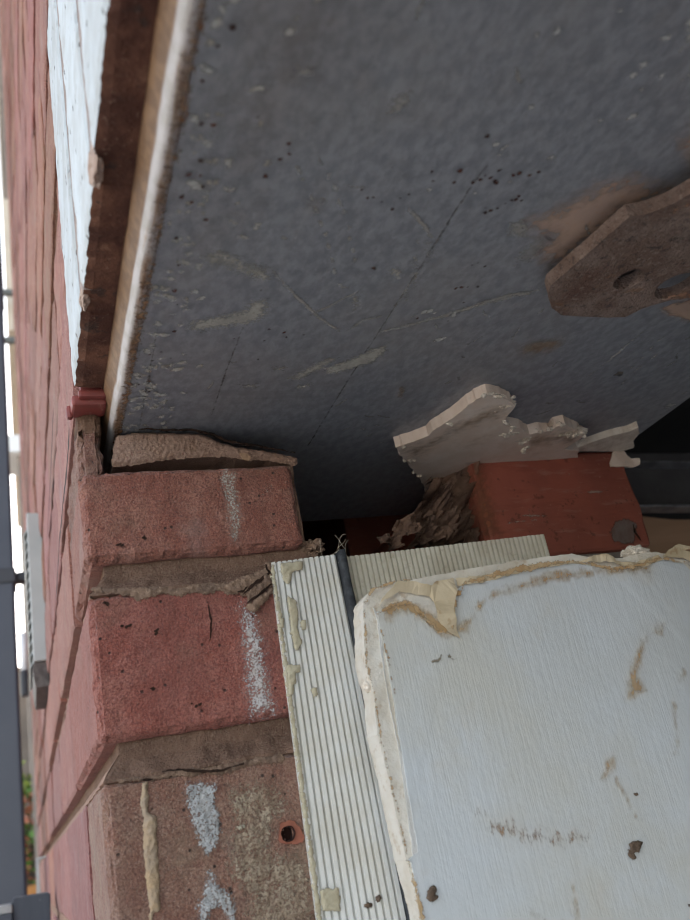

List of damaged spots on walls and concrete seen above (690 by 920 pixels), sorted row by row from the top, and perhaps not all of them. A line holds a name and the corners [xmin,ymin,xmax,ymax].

corrosion [533,180,671,259]
peeling [111,428,298,474]
spalling [223,561,276,613]
damp [239,606,275,716]
crack [142,763,244,781]